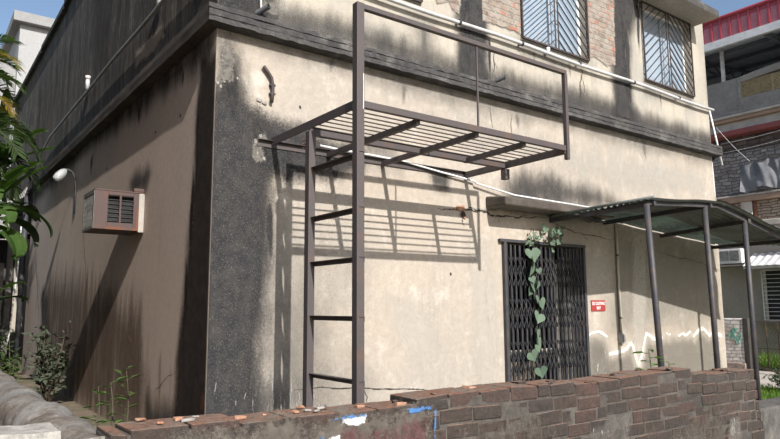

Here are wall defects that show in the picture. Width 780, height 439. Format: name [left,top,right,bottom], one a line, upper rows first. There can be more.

water stain [218,0,353,42]
spalling [482,0,522,34]
spalling [586,0,616,67]
water stain [364,0,711,143]
water stain [315,137,352,180]
water stain [32,36,306,420]
crack [438,207,614,241]